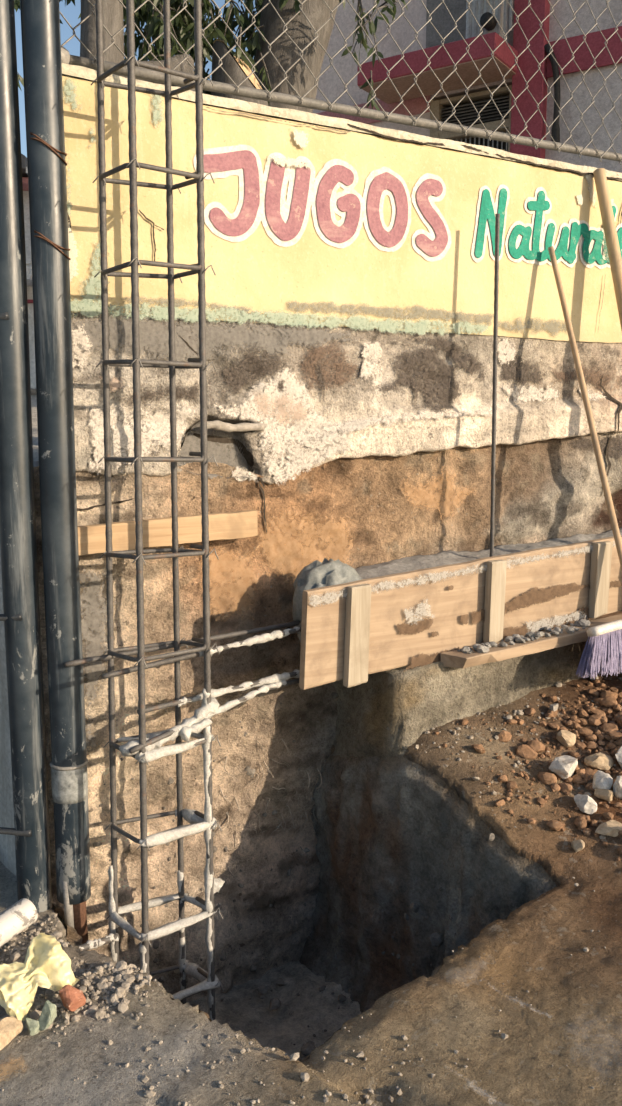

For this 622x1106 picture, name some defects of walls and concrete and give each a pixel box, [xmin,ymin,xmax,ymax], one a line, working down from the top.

damp [72,298,359,406]
flaking render [65,151,560,557]
damp [288,301,567,335]
damp [379,336,485,414]
damp [499,354,611,389]
flaking render [577,386,605,401]
crack [600,376,622,476]